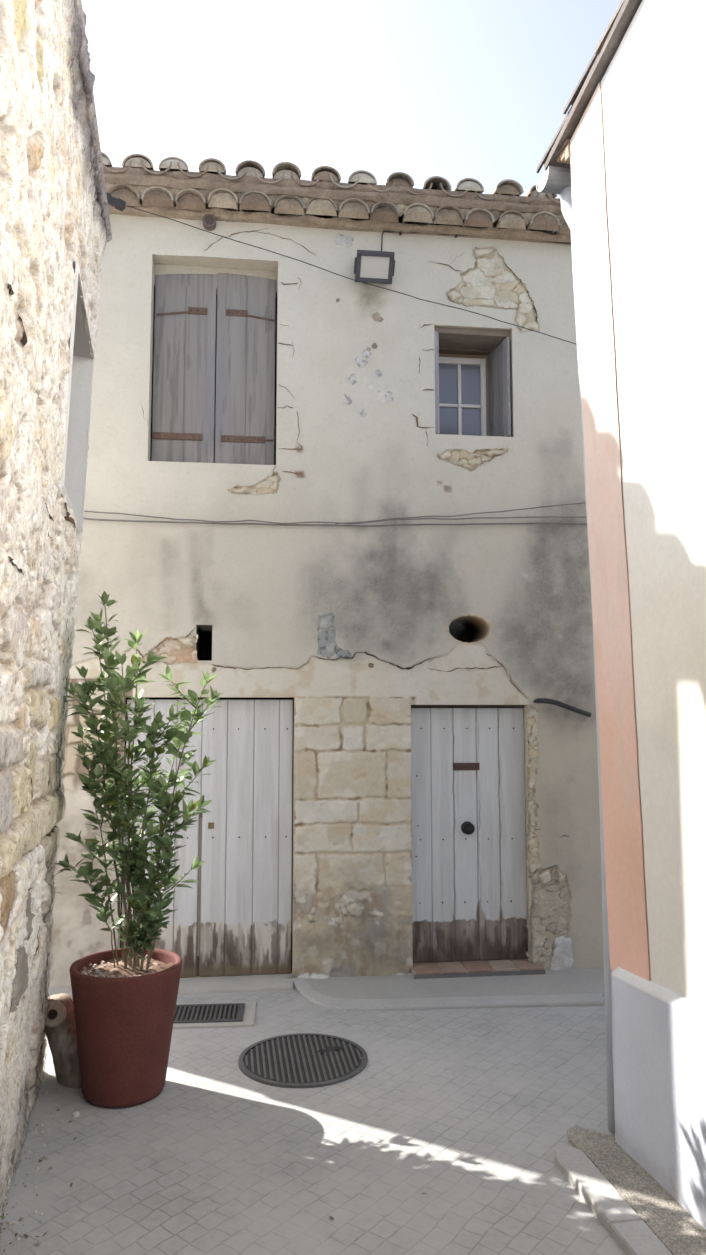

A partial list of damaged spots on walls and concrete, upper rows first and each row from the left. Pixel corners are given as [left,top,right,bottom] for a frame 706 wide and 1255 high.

flaking render [446,246,540,333]
flaking render [227,473,281,495]
flaking render [437,448,509,472]
flaking render [141,634,198,665]
crack [214,649,527,698]
flaking render [526,705,572,970]